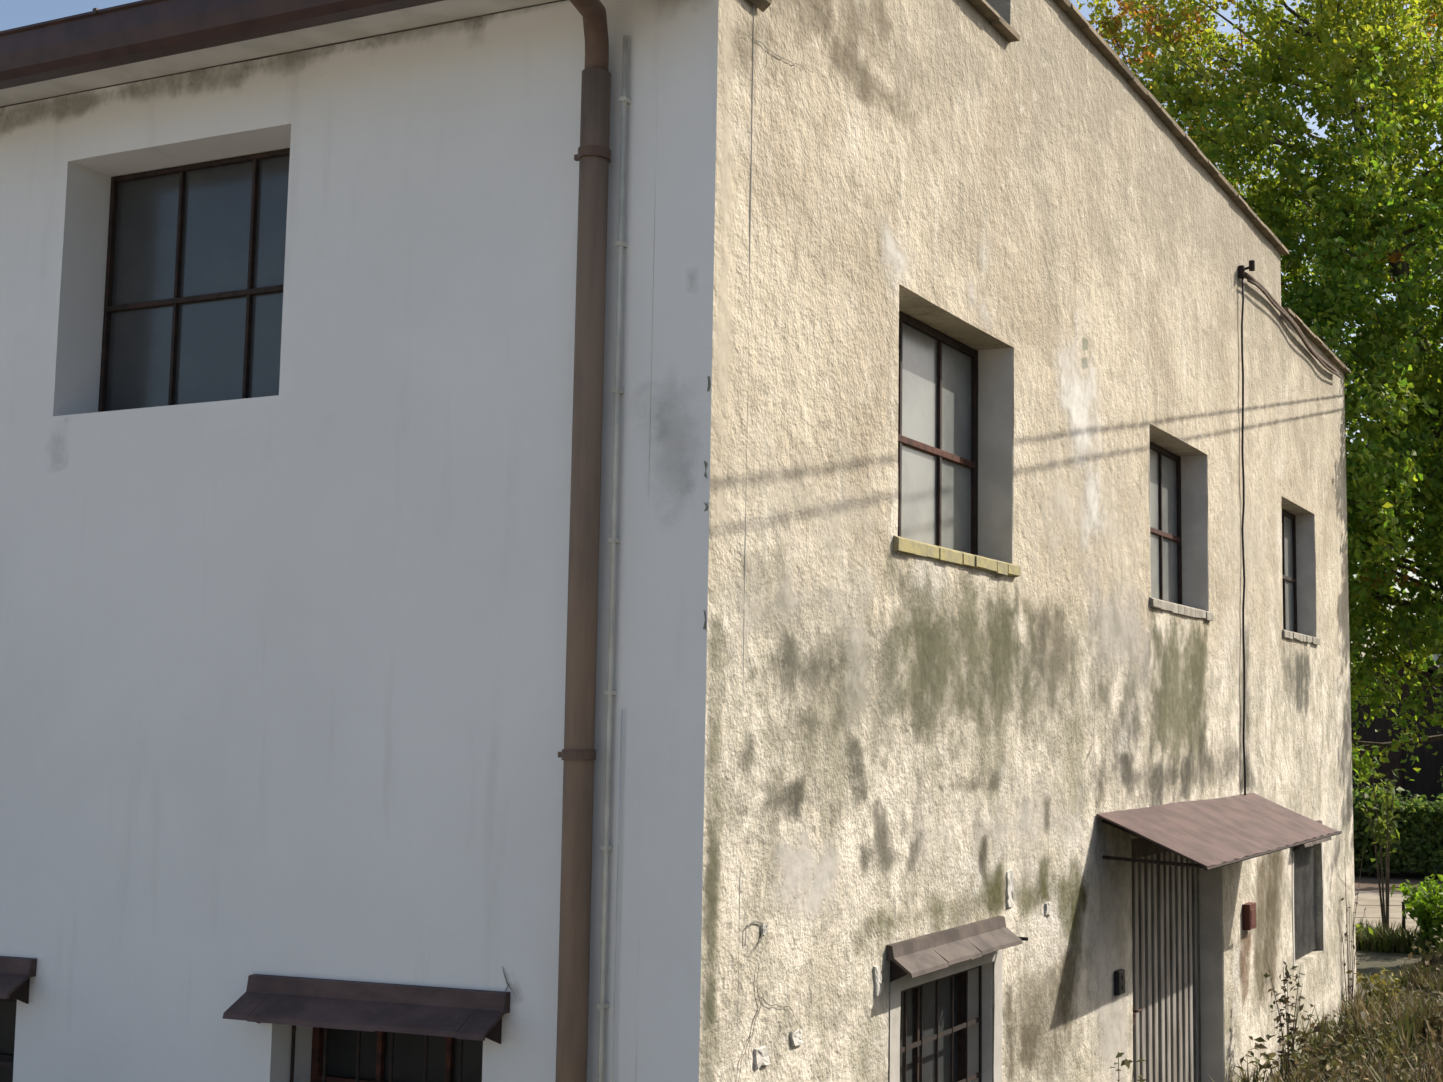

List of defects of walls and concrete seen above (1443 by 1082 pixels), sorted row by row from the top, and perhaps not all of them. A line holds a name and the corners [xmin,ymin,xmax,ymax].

leakage [895,590,1034,723]
leakage [1123,624,1229,805]
leakage [709,847,717,918]
leakage [788,782,803,816]
leakage [852,742,893,870]
leakage [980,838,1002,904]
crack [738,920,798,1082]
leakage [1008,892,1086,1067]